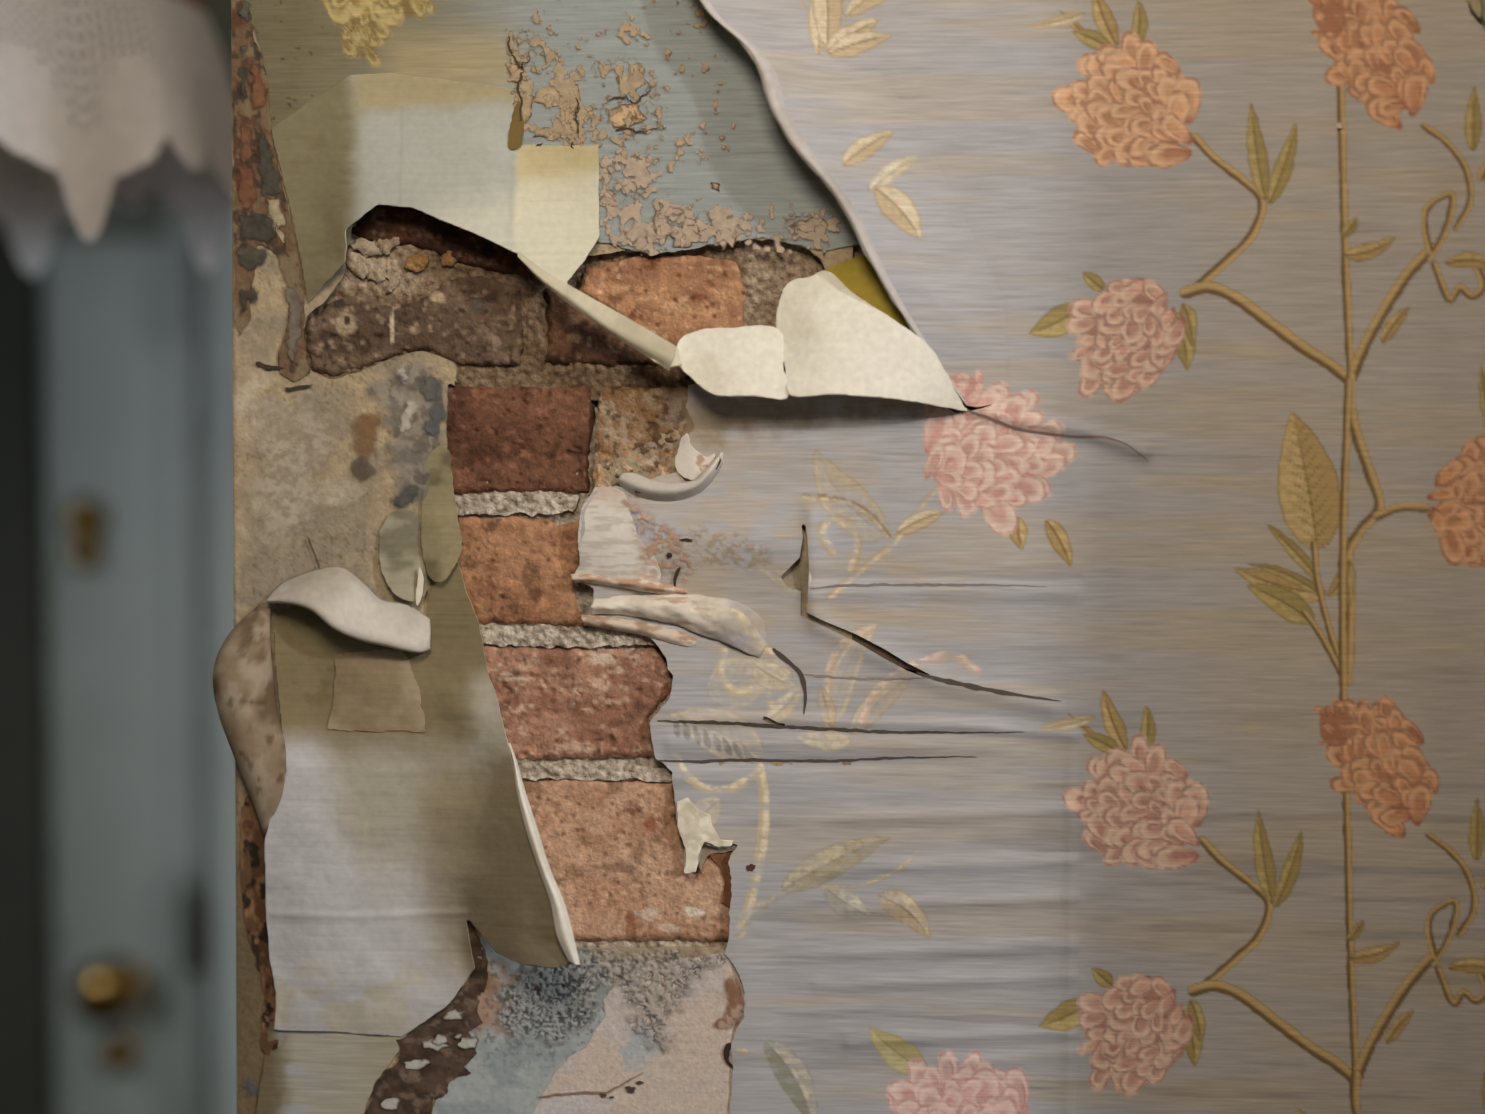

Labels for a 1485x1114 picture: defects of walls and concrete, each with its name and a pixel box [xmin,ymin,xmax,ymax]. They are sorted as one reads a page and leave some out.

peeling [213,0,840,1114]
crack [807,571,1045,596]
crack [772,633,1060,714]